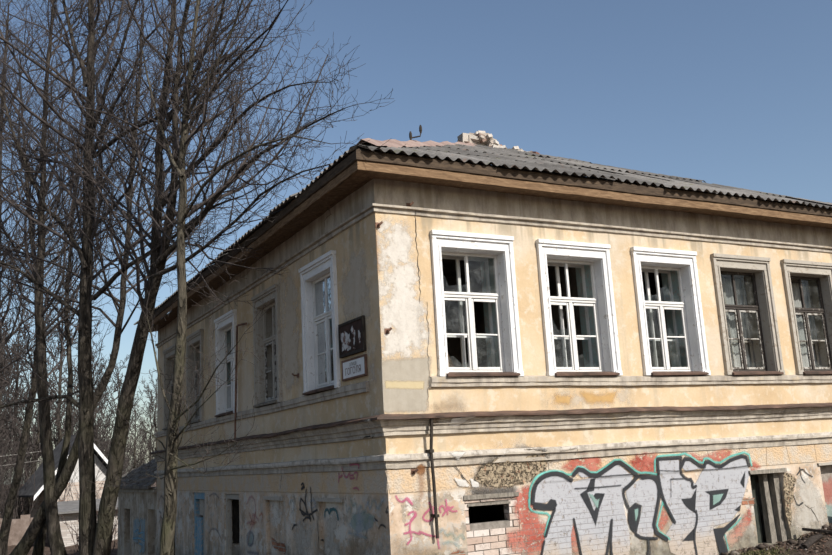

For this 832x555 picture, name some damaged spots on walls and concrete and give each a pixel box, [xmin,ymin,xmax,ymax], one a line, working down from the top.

peeling [376,220,429,358]
peeling [341,327,361,351]
flaking render [451,444,578,488]